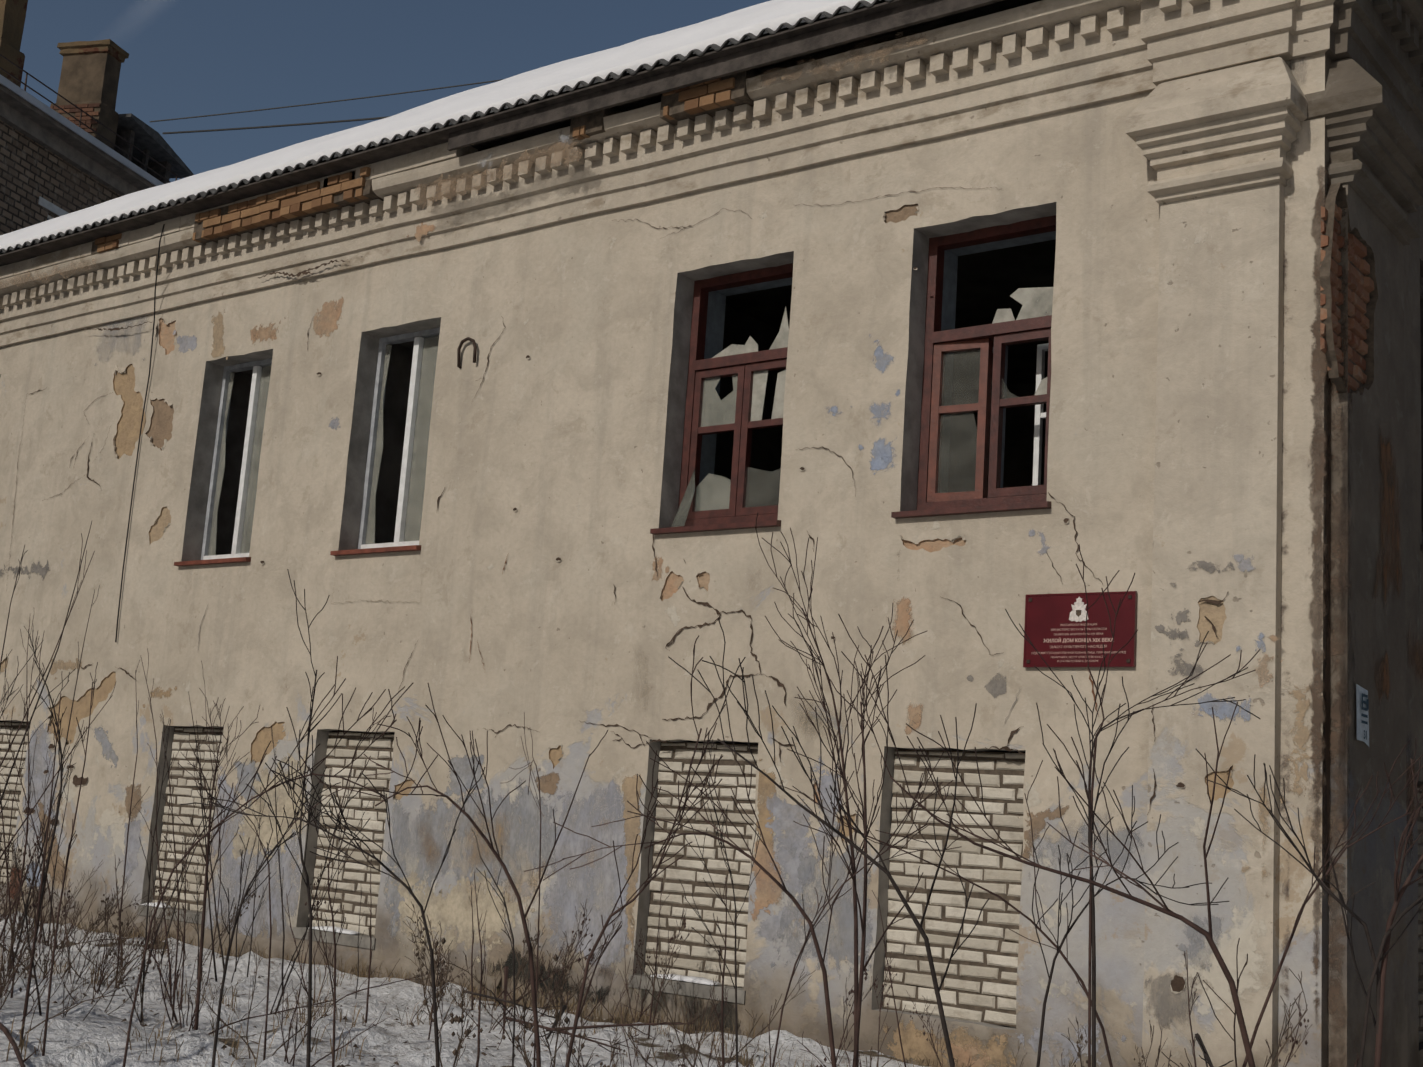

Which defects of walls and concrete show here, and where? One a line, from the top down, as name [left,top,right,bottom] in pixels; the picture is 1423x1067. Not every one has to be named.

flaking render [192,167,371,242]
flaking render [1320,183,1378,395]
spalling [113,364,174,459]
spalling [899,534,966,553]
crack [1046,492,1103,584]
crack [580,534,786,748]
spalling [1181,596,1227,650]
peeling [119,784,145,883]
peeling [204,721,309,937]
crack [772,738,796,762]
peeling [750,756,872,976]
spalling [1205,765,1234,800]